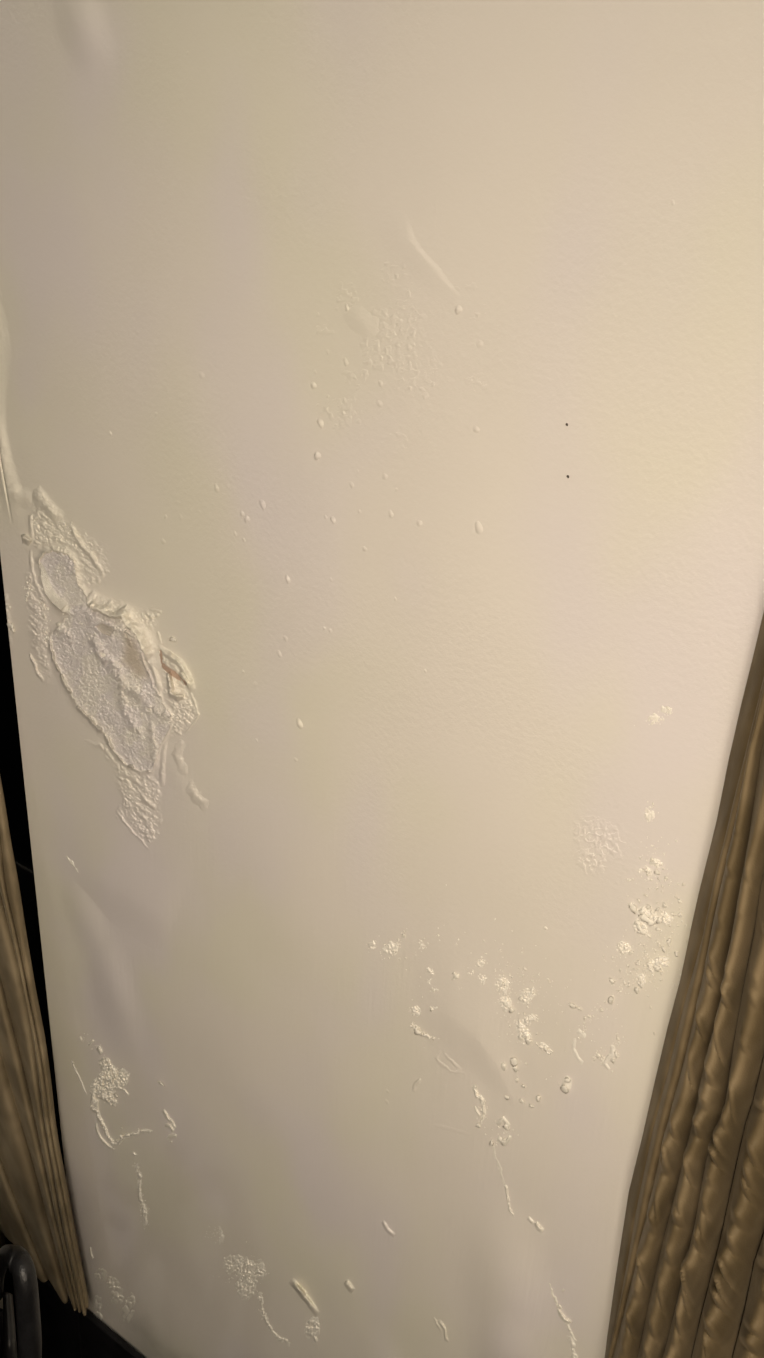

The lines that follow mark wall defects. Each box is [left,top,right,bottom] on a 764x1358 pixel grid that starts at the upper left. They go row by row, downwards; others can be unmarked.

peeling [4,486,210,850]
peeling [71,1033,177,1229]
peeling [89,1247,135,1323]
peeling [206,1226,290,1347]